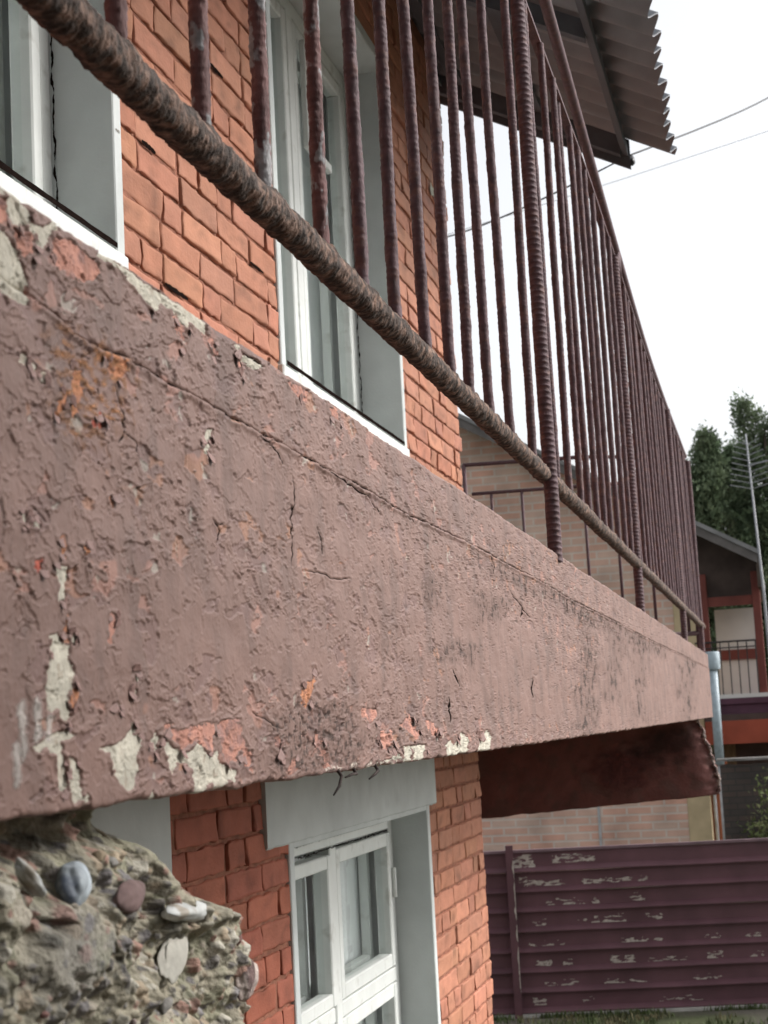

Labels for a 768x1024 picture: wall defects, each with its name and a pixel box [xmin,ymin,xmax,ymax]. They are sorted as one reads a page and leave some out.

peeling [0,187,220,365]
peeling [16,352,84,425]
peeling [234,344,261,383]
crack [287,315,405,445]
crack [88,342,702,665]
peeling [33,535,89,804]
peeling [100,663,253,794]
peeling [274,701,492,796]
peeling [512,854,565,989]
peeling [552,853,595,863]
peeling [582,875,647,884]
peeling [611,936,663,963]